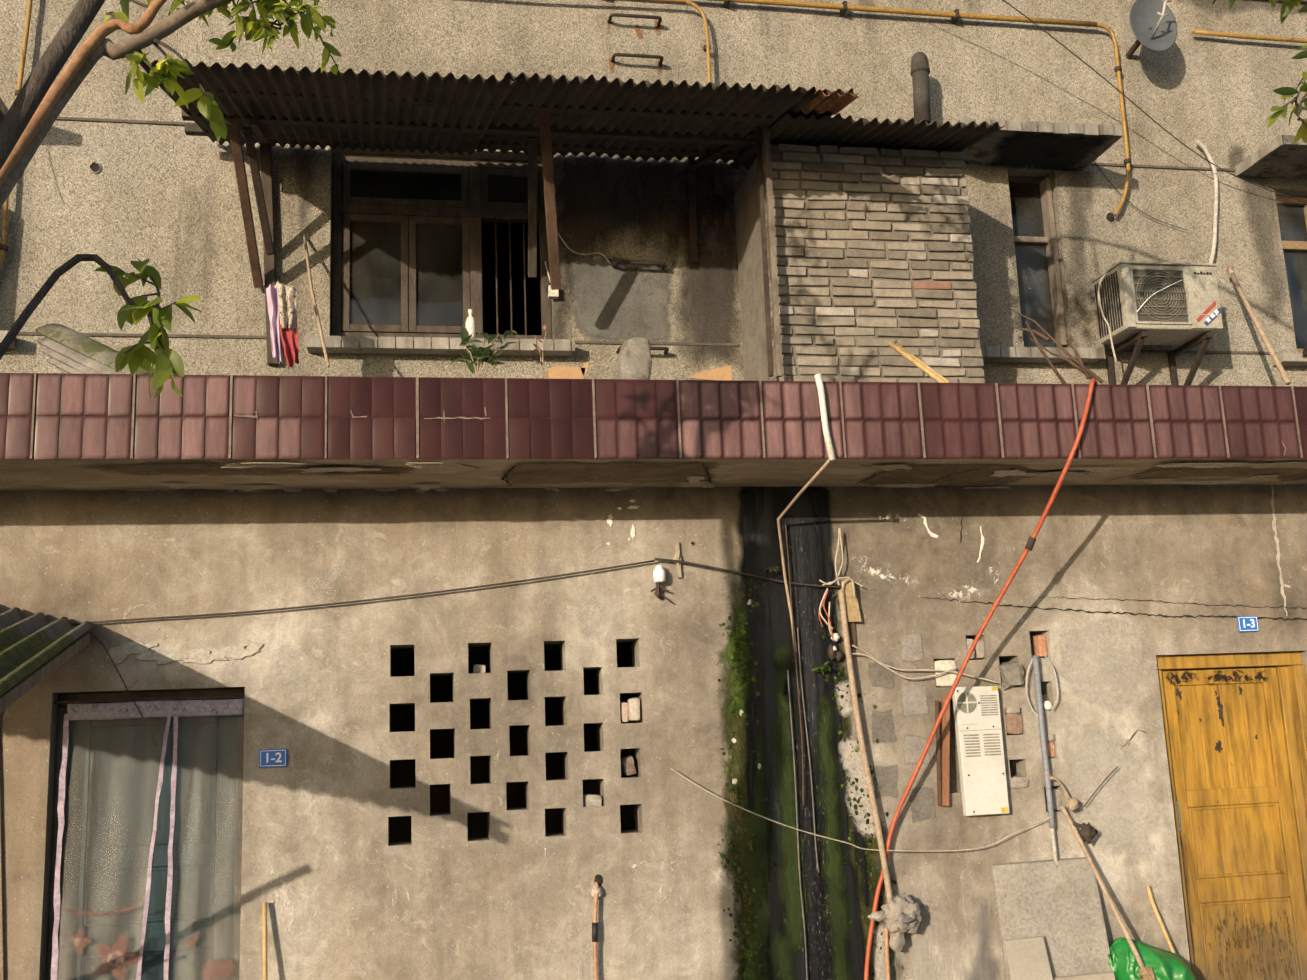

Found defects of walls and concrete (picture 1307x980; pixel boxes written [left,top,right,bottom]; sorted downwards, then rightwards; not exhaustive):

crack [922,485,1307,620]
damp [717,486,956,980]
damp [973,912,996,980]